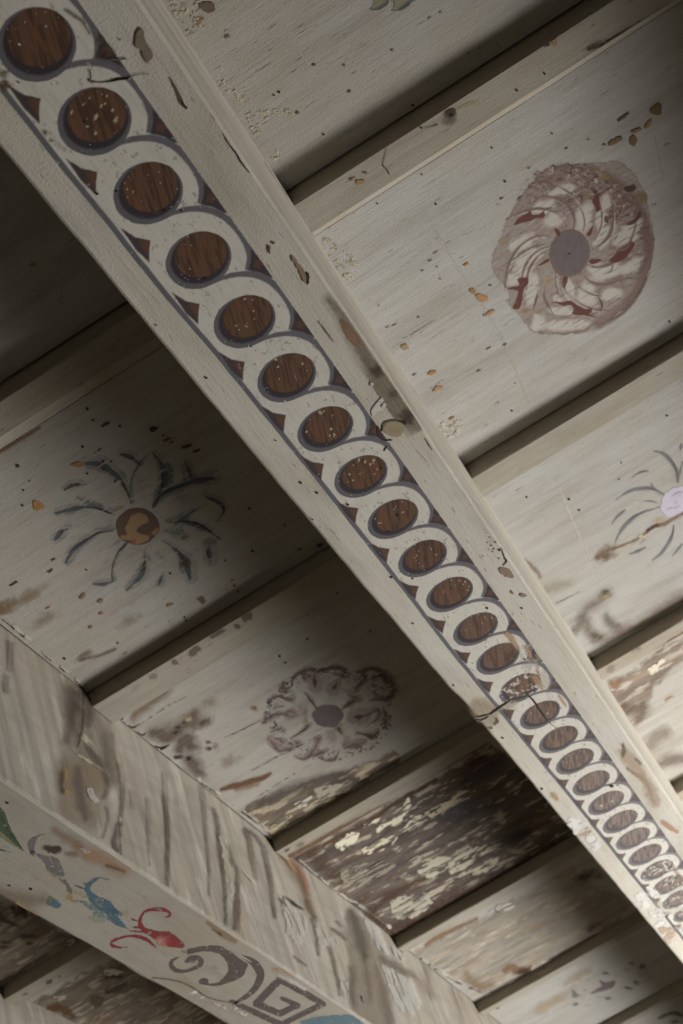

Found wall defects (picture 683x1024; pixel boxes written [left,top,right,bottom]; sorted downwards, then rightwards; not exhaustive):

crack [89,58,149,83]
crack [475,692,558,729]
peeling [610,639,683,727]
peeling [245,751,399,838]
peeling [293,745,601,1015]
peeling [283,898,338,951]